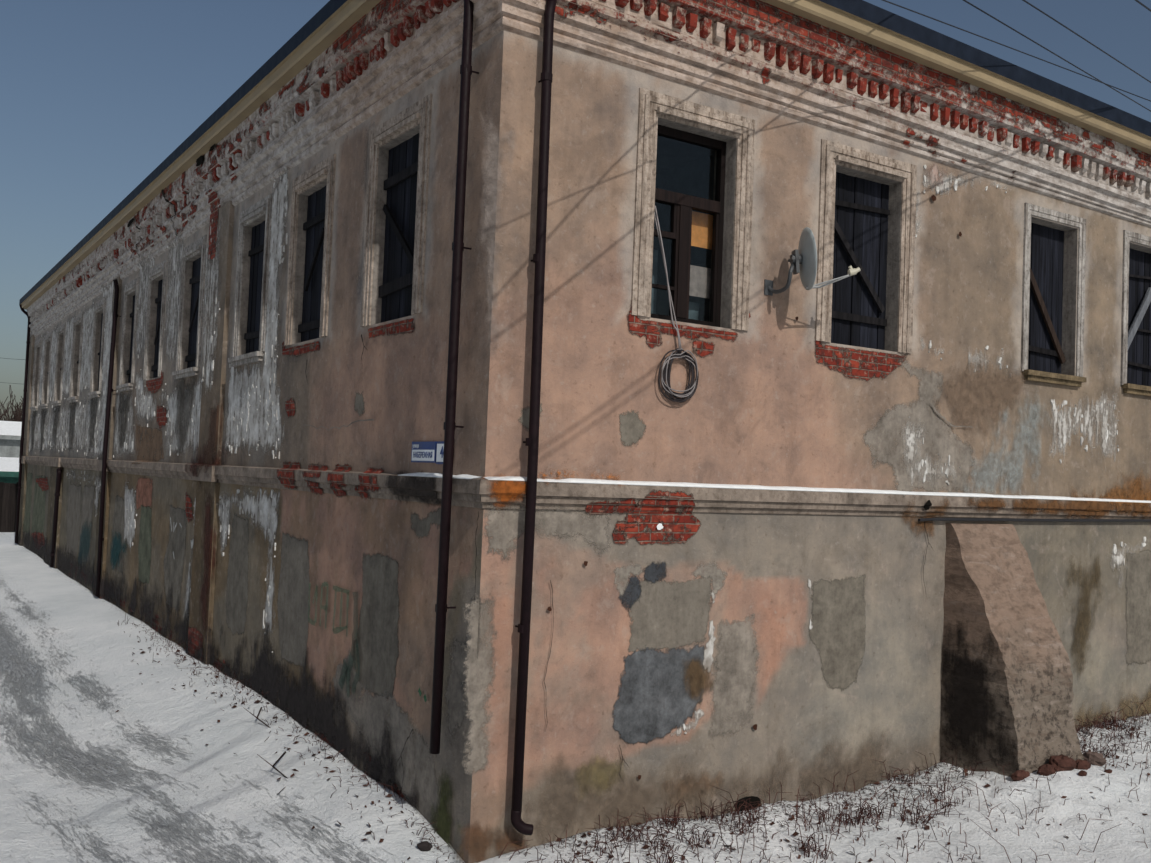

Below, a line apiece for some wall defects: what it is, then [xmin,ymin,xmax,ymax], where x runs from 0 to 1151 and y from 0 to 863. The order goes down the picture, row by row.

flaking render [555,0,611,29]
flaking render [695,0,1151,171]
peeling [29,0,414,517]
flaking render [627,301,738,357]
flaking render [815,336,906,381]
peeling [219,156,384,634]
peeling [1050,395,1120,463]
peeling [123,482,137,547]
flaking render [585,489,701,545]
damp [18,525,418,810]
peeling [703,620,716,673]
damp [940,628,1015,764]